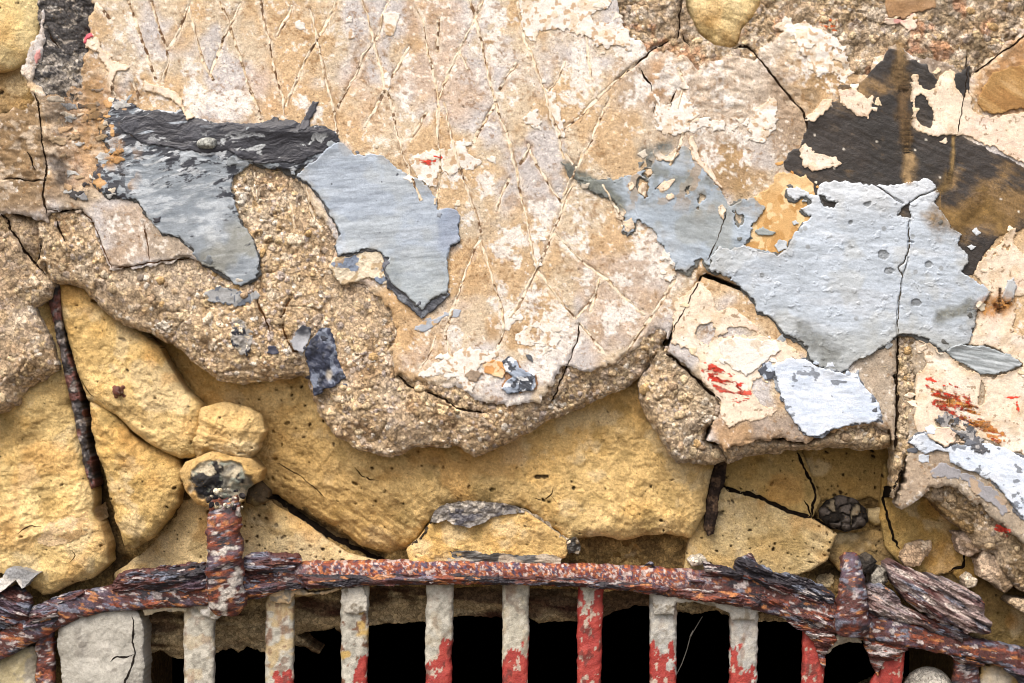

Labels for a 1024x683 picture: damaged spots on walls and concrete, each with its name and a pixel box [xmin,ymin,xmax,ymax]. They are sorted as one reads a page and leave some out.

crack [734,45,808,128]
crack [958,35,1024,131]
crack [1,94,189,275]
crack [96,0,727,414]
spalling [0,0,1024,520]
crack [723,453,842,530]
corrosion [785,619,837,668]
corrosion [863,639,909,676]